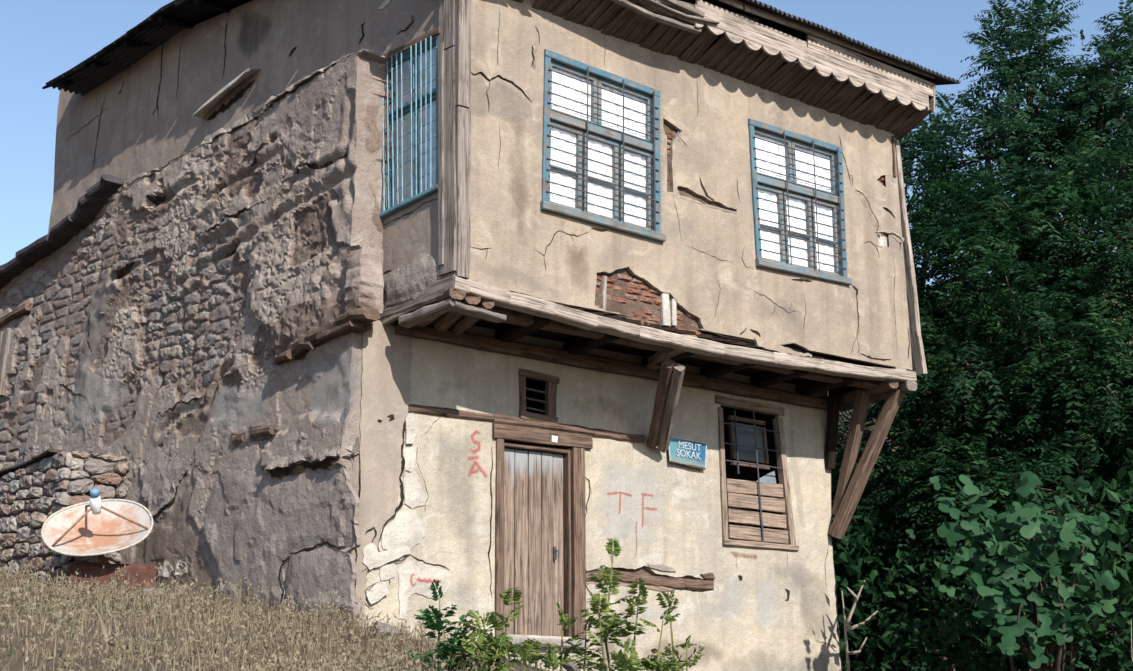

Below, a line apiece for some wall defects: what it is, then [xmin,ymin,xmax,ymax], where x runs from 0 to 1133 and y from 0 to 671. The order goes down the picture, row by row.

crack [396,14,414,35]
crack [116,19,369,194]
flaking render [663,121,736,214]
crack [700,177,740,202]
crack [839,136,904,253]
flaking render [595,268,701,335]
crack [672,194,811,343]
crack [851,283,910,361]
flaking render [263,436,360,477]
crack [355,460,363,499]
peeling [362,413,451,619]
crack [278,538,409,615]